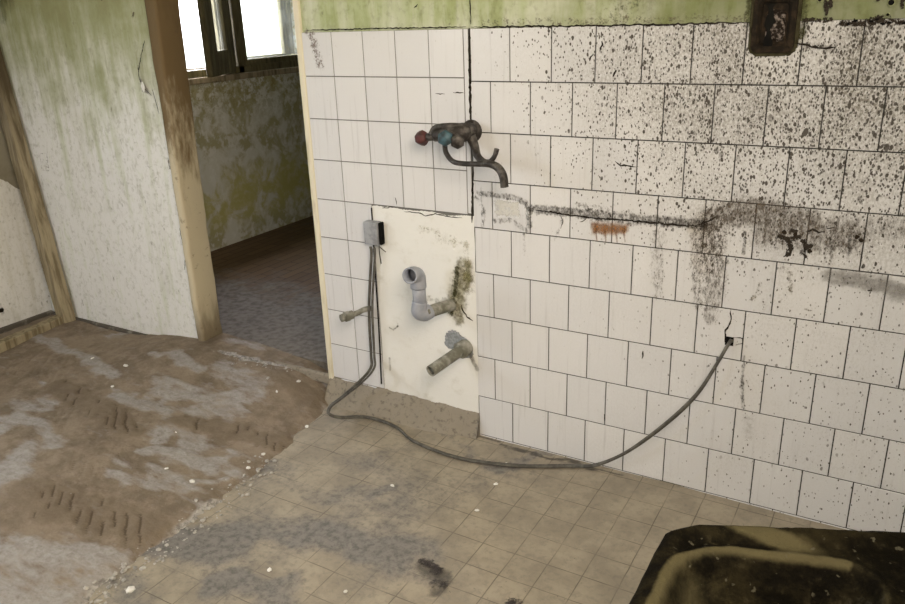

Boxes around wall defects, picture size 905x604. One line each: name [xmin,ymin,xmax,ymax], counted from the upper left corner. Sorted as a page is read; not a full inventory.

spalling [372,198,479,413]
corrosion [591,223,628,239]
crack [529,205,717,230]
damp [691,198,905,323]